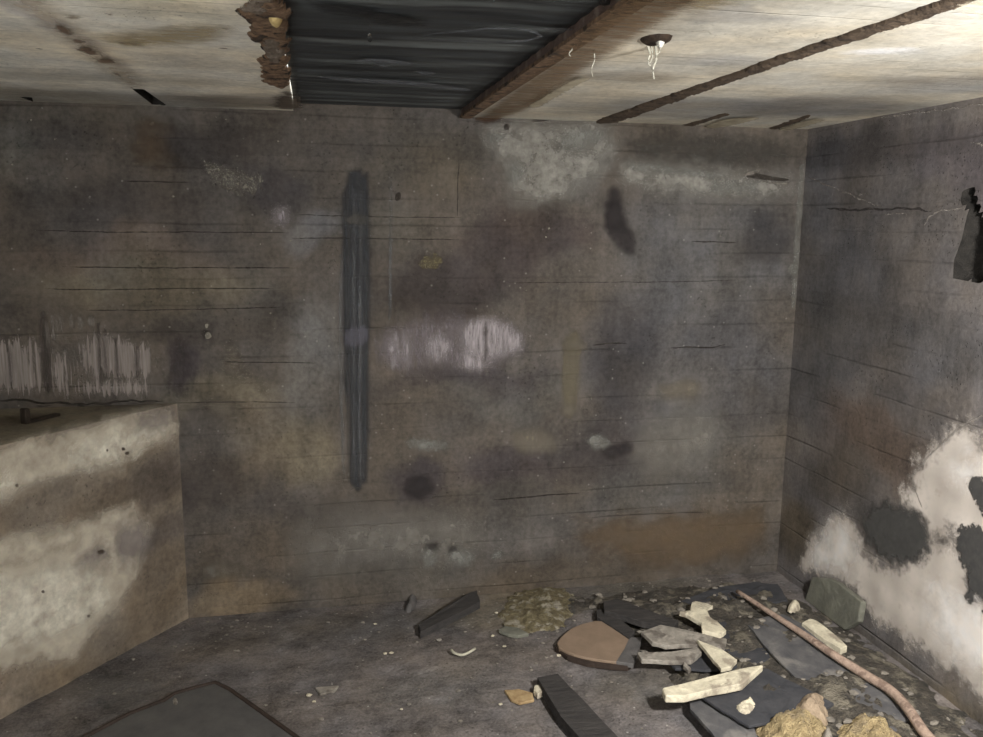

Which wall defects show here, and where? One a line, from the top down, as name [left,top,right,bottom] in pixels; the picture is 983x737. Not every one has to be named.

damp [606,189,634,253]
spalling [953,187,983,283]
mould [862,500,931,566]
mould [956,476,983,612]